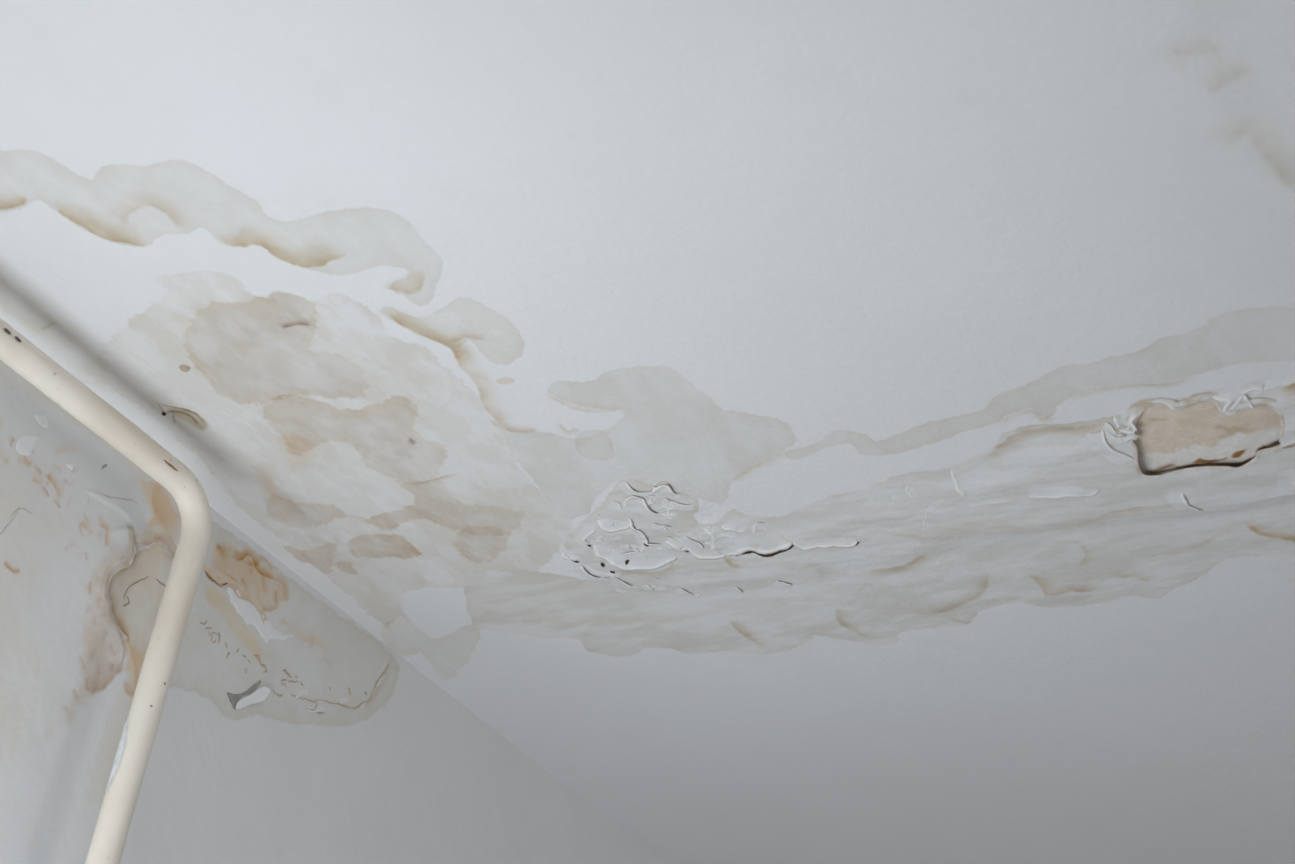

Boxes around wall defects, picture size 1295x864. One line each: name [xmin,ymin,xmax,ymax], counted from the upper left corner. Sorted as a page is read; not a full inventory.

damp [0,149,1295,728]
flaking render [1087,382,1285,478]
peeling [562,481,859,599]
flaking render [227,680,270,710]